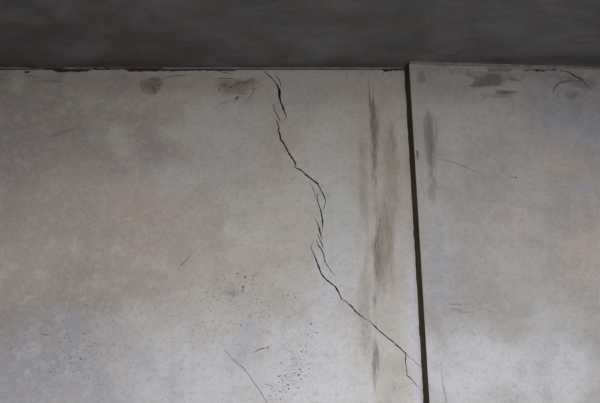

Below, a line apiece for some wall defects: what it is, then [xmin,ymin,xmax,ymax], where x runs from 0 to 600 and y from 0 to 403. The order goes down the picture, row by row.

crack [264,71,422,391]
crack [554,71,588,94]